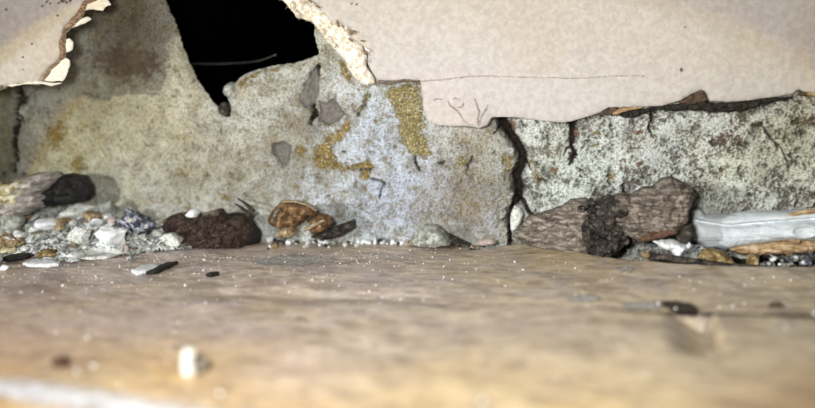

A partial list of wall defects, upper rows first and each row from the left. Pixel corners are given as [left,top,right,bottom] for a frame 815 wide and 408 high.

spalling [165,0,375,125]
crack [376,77,419,85]
spalling [272,142,291,167]
crack [435,98,534,245]
flaking render [23,245,123,268]